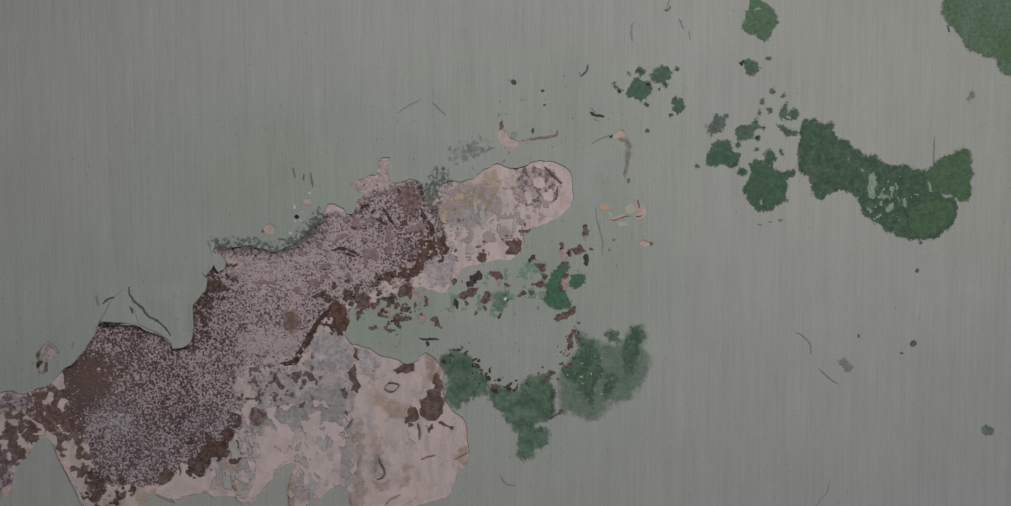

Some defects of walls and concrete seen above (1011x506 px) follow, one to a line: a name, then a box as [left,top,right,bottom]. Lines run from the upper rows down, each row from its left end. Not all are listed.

spalling [0,157,593,506]
water stain [440,326,647,460]